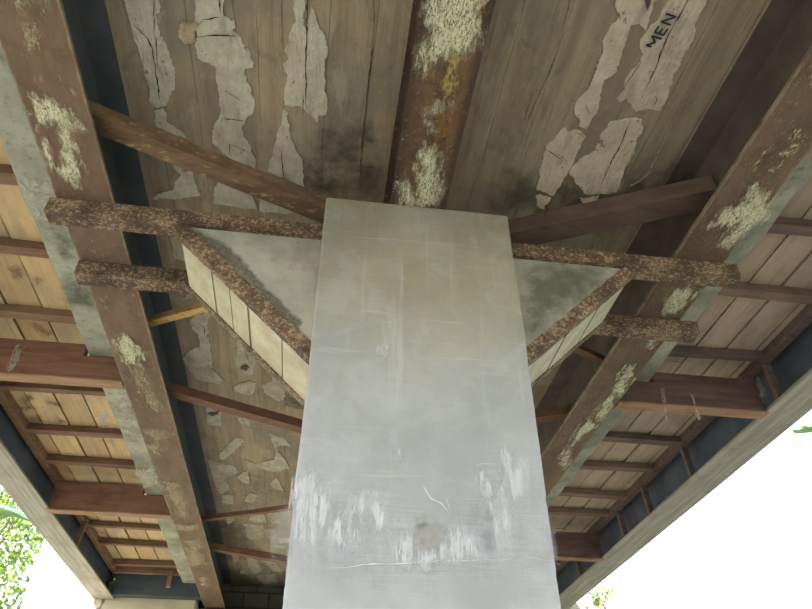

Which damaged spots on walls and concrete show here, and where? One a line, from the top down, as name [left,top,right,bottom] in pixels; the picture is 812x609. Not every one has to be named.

efflorescence [31,95,83,186]
peeling [124,0,187,138]
peeling [178,0,257,169]
peeling [268,0,328,187]
rust [441,52,463,97]
peeling [536,0,707,209]
peeling [213,182,292,214]
efflorescence [707,182,770,249]
efflorescence [112,334,159,408]
peeling [207,425,292,505]
water stain [305,472,330,552]
water stain [418,526,482,568]